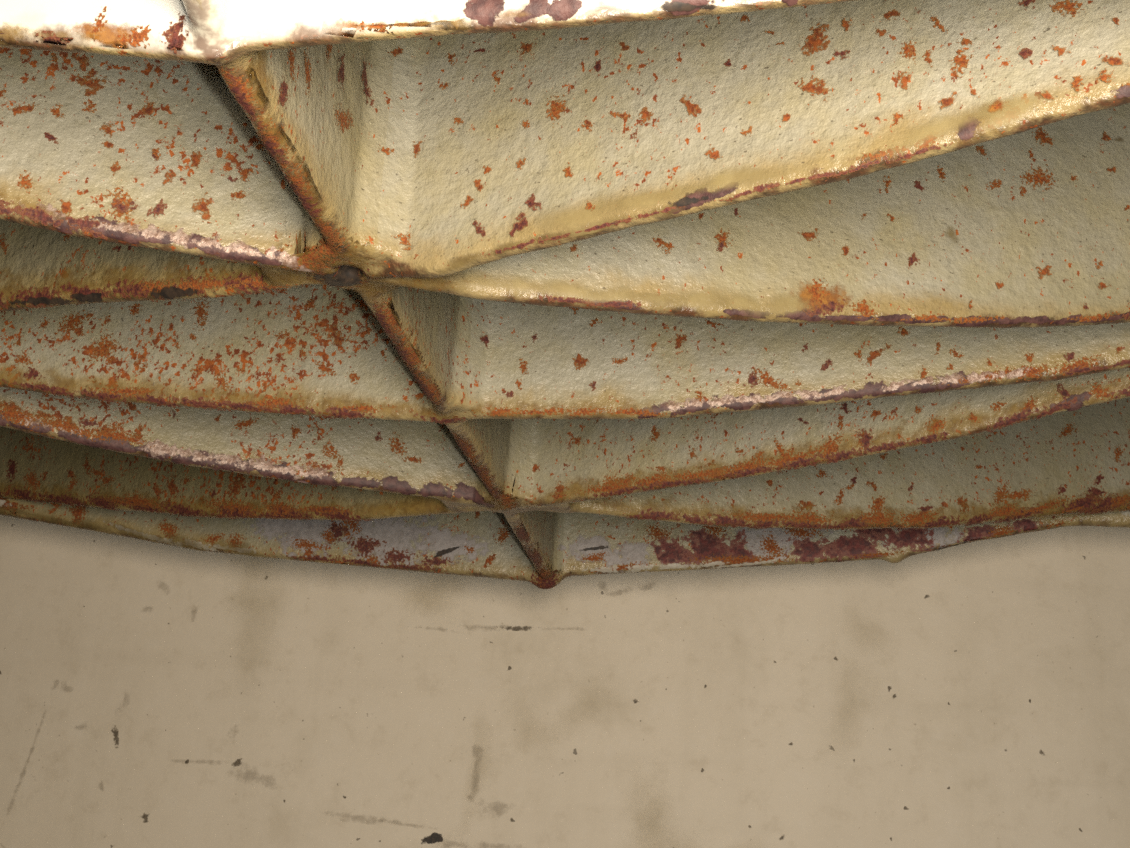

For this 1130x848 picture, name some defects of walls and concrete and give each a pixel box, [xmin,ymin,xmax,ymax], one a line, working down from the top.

corrosion [36,6,189,113]
corrosion [325,21,428,132]
corrosion [799,17,853,60]
corrosion [1070,54,1130,98]
corrosion [712,91,968,216]
corrosion [0,48,352,364]
corrosion [512,278,1130,364]
corrosion [0,340,383,440]
corrosion [935,340,1130,439]
corrosion [366,296,563,589]
corrosion [550,401,948,503]
corrosion [584,474,1130,573]